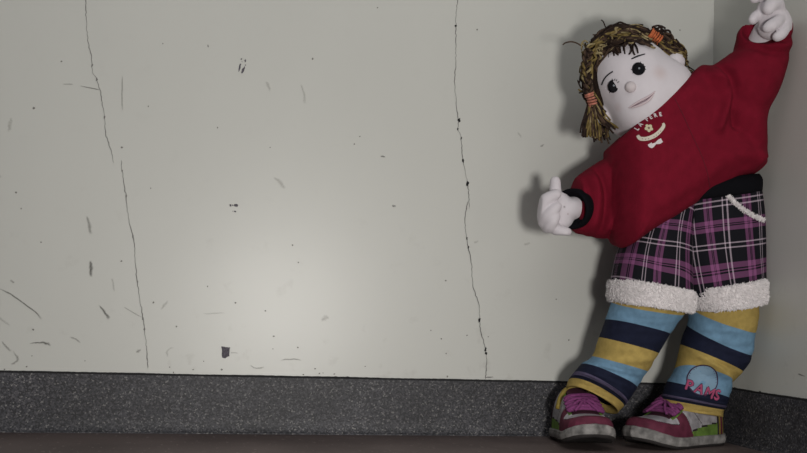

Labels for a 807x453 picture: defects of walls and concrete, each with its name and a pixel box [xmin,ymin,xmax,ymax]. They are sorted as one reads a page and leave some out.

crack [85,0,148,366]
crack [454,0,491,379]